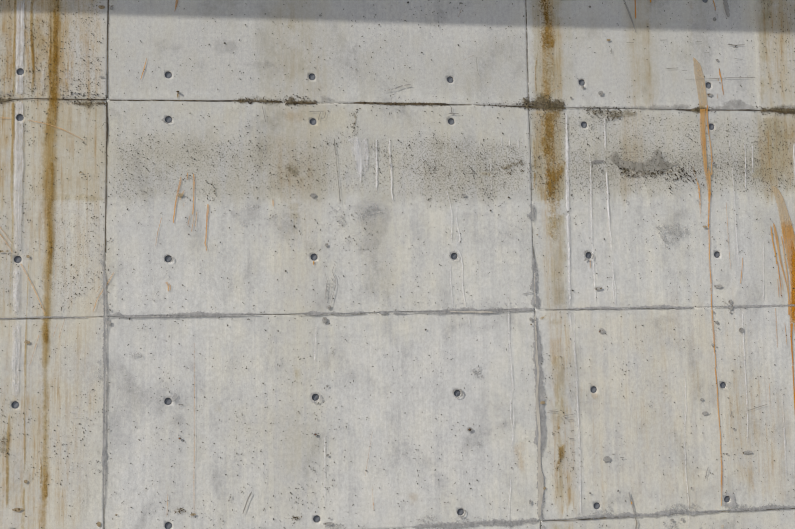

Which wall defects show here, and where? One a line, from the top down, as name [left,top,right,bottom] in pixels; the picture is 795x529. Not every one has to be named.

damp [590,150,701,182]
rust [693,57,713,229]
rust [735,126,795,410]
rust [713,335,723,506]